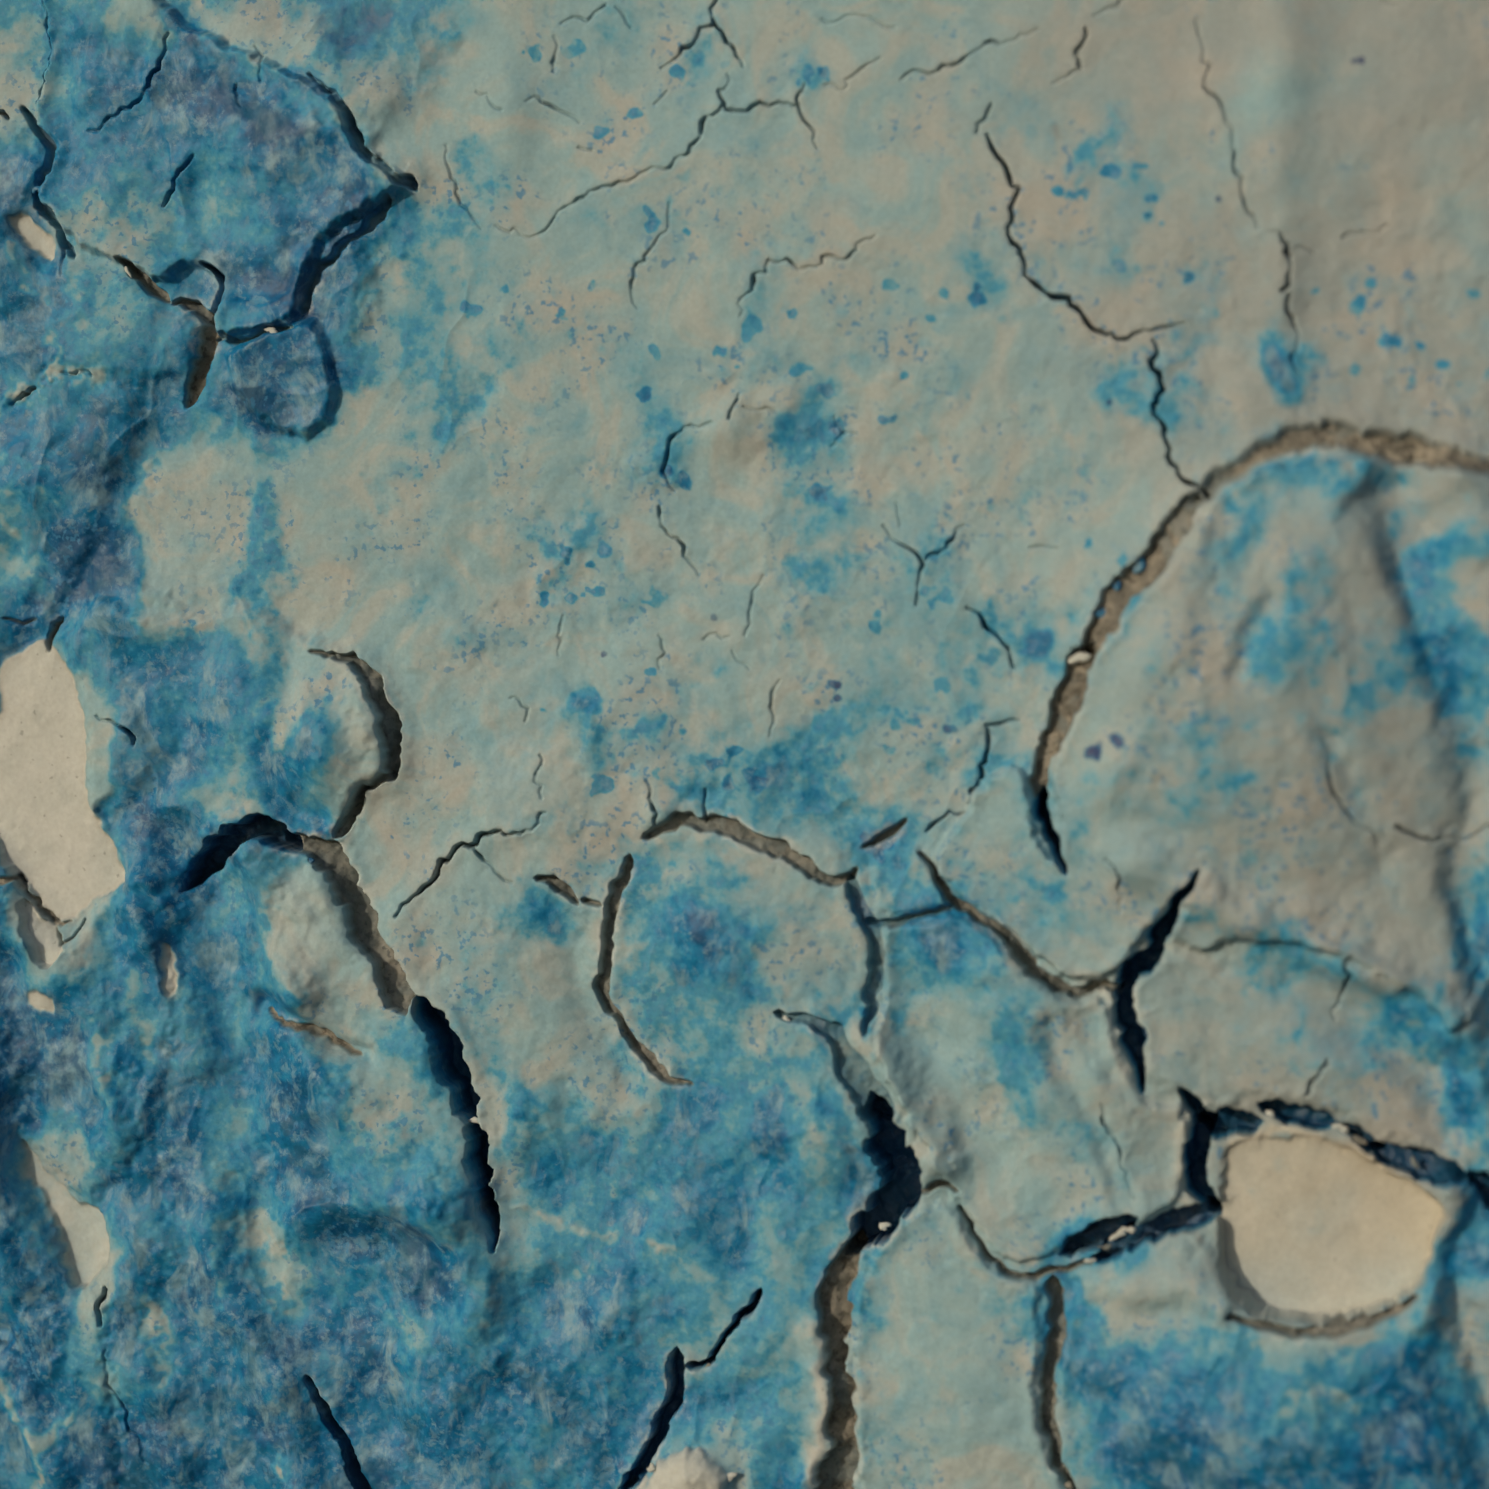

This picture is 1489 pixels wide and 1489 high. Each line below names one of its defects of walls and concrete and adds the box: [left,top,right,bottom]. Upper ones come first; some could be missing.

crack [0,0,1041,414]
crack [1052,0,1123,86]
crack [1194,19,1318,377]
crack [299,1370,373,1489]
crack [173,646,547,1260]
peeling [0,0,879,1489]
crack [535,102,1489,1489]
peeling [854,843,1489,1489]